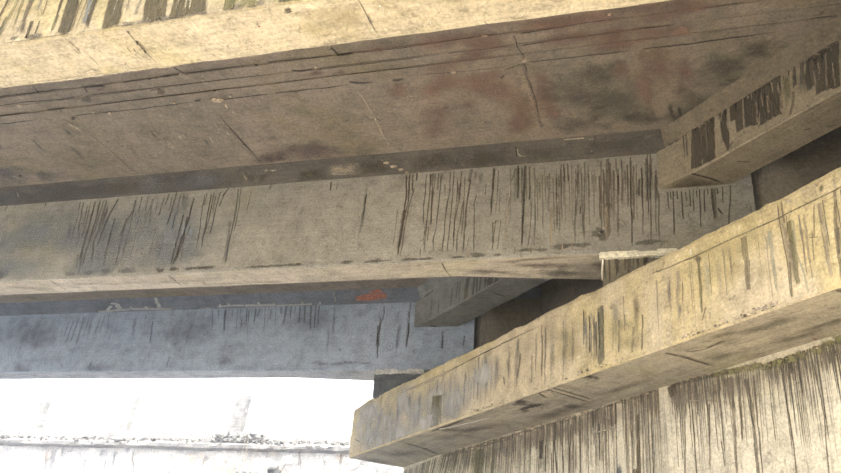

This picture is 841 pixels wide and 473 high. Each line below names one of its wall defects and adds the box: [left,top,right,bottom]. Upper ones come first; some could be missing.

damp [0,0,48,37]
damp [51,0,97,34]
damp [102,0,206,28]
crack [500,25,542,127]
damp [68,173,251,272]
damp [390,154,511,261]
damp [583,306,604,365]
damp [409,341,841,473]